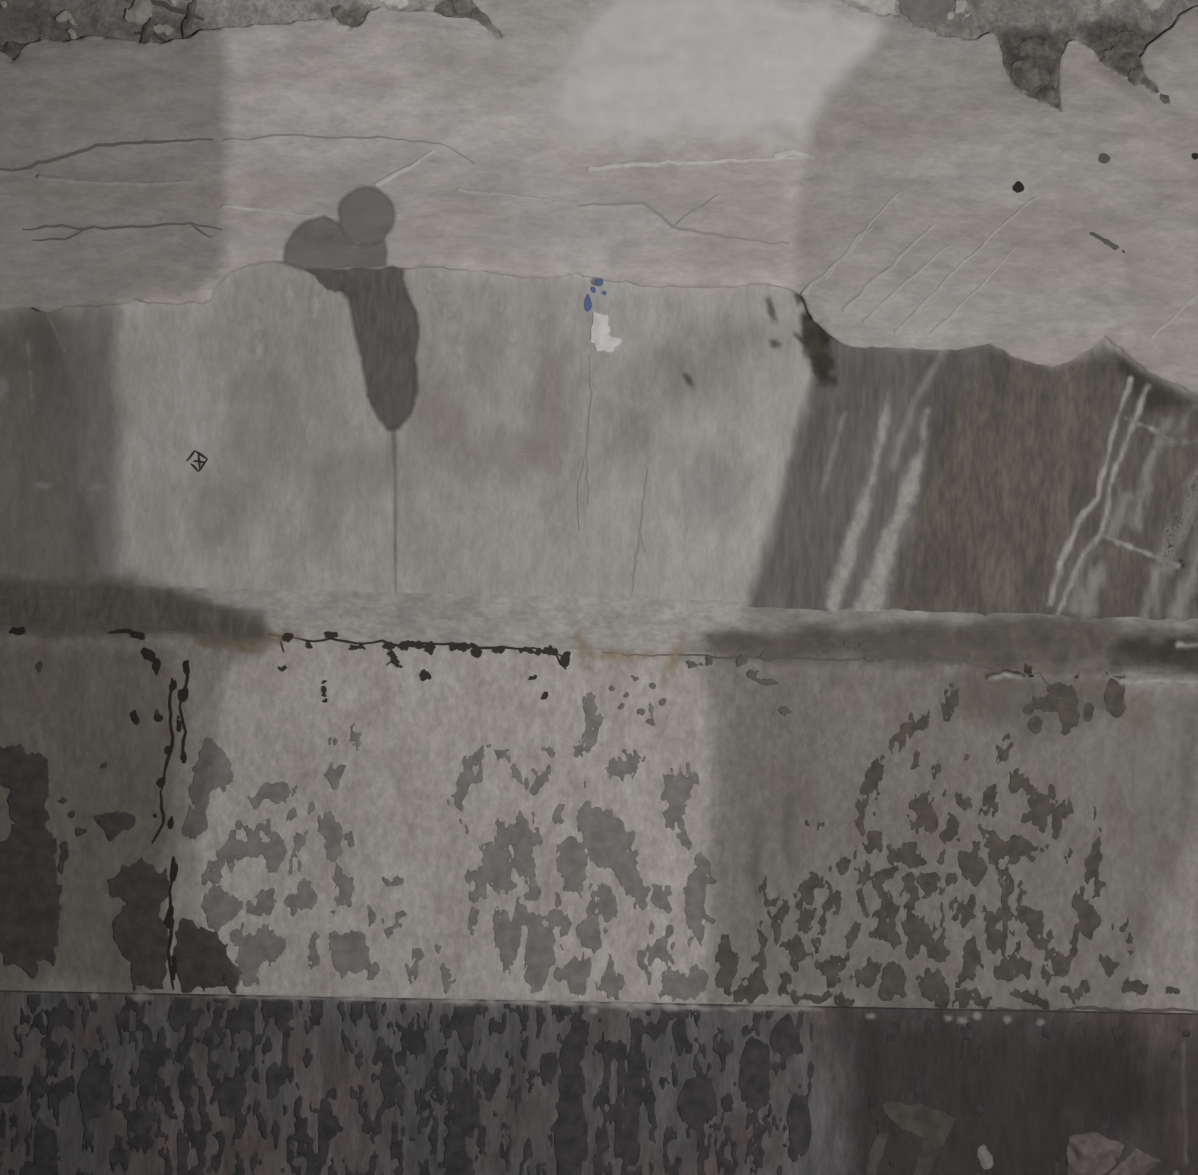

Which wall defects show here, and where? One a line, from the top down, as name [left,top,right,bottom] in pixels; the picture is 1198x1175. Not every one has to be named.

spalling [332,5,366,27]
spalling [434,0,488,26]
spalling [999,32,1066,107]
spalling [1089,24,1170,104]
crack [0,134,474,172]
crack [23,222,222,241]
leakage [284,187,419,447]
leakage [713,311,1198,686]
spalling [282,633,313,649]
crack [268,633,567,669]
spalling [383,640,571,668]
peeling [0,675,1149,1175]